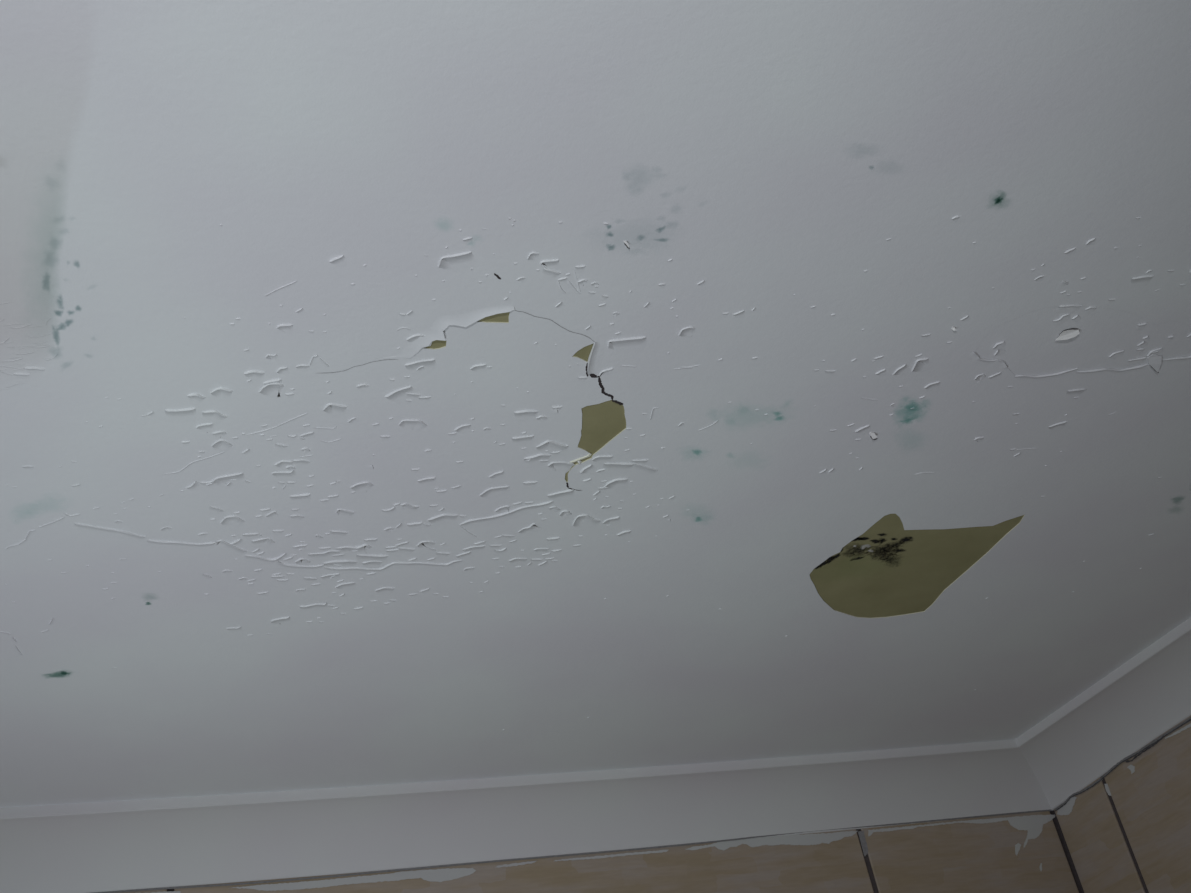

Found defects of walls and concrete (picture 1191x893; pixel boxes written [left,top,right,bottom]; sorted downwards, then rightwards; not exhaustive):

peeling [384,305,514,358]
crack [514,307,623,405]
peeling [572,342,607,376]
peeling [565,400,626,491]
peeling [810,514,1025,618]